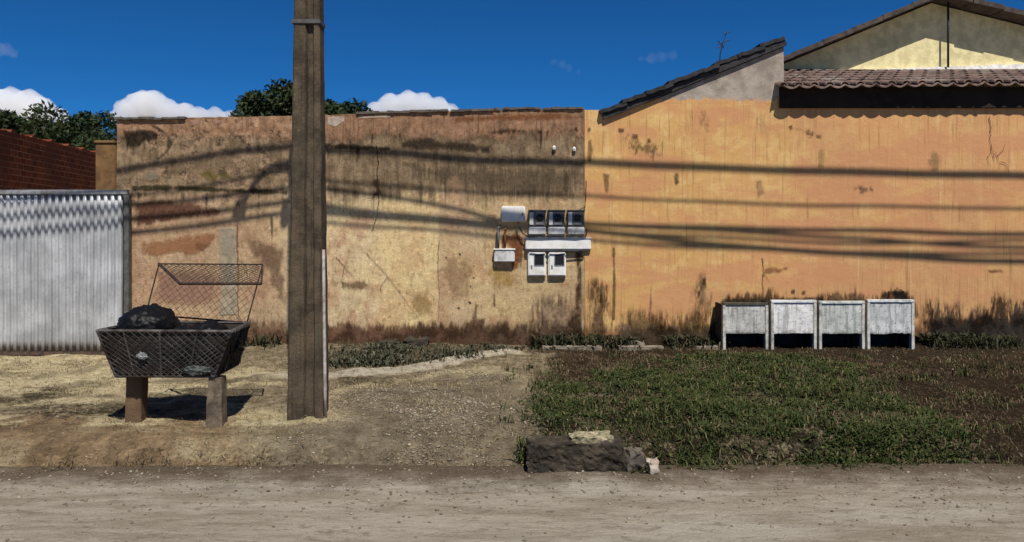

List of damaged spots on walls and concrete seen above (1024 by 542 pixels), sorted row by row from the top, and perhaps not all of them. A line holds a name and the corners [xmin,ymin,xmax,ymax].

damp [326,133,489,158]
crack [987,116,1008,169]
damp [412,165,576,197]
crack [336,146,450,320]
corrosion [502,233,523,268]
damp [328,247,864,346]
damp [877,287,1024,344]